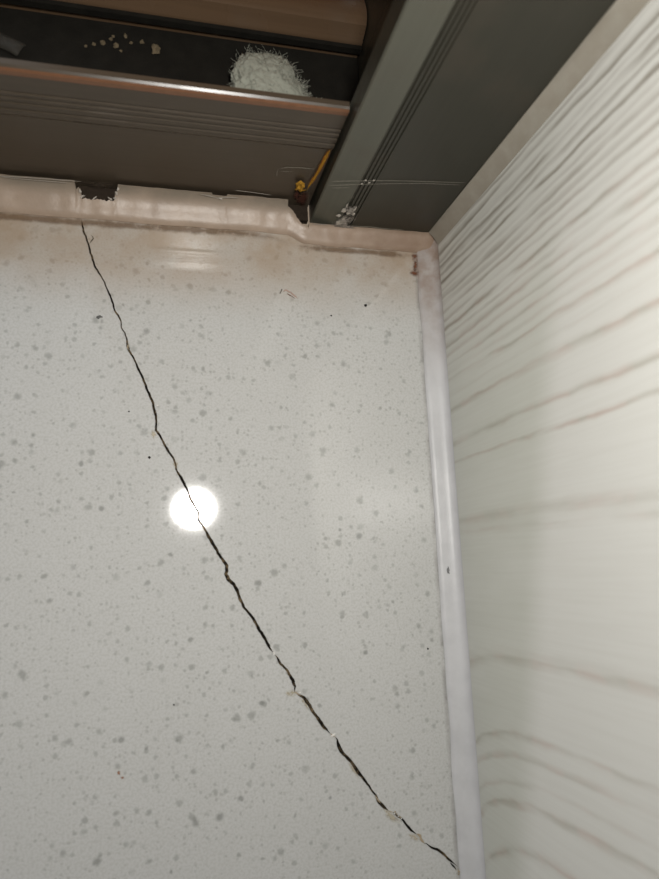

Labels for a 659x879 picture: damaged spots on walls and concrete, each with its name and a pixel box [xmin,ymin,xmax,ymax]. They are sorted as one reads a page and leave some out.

crack [81,220,460,875]